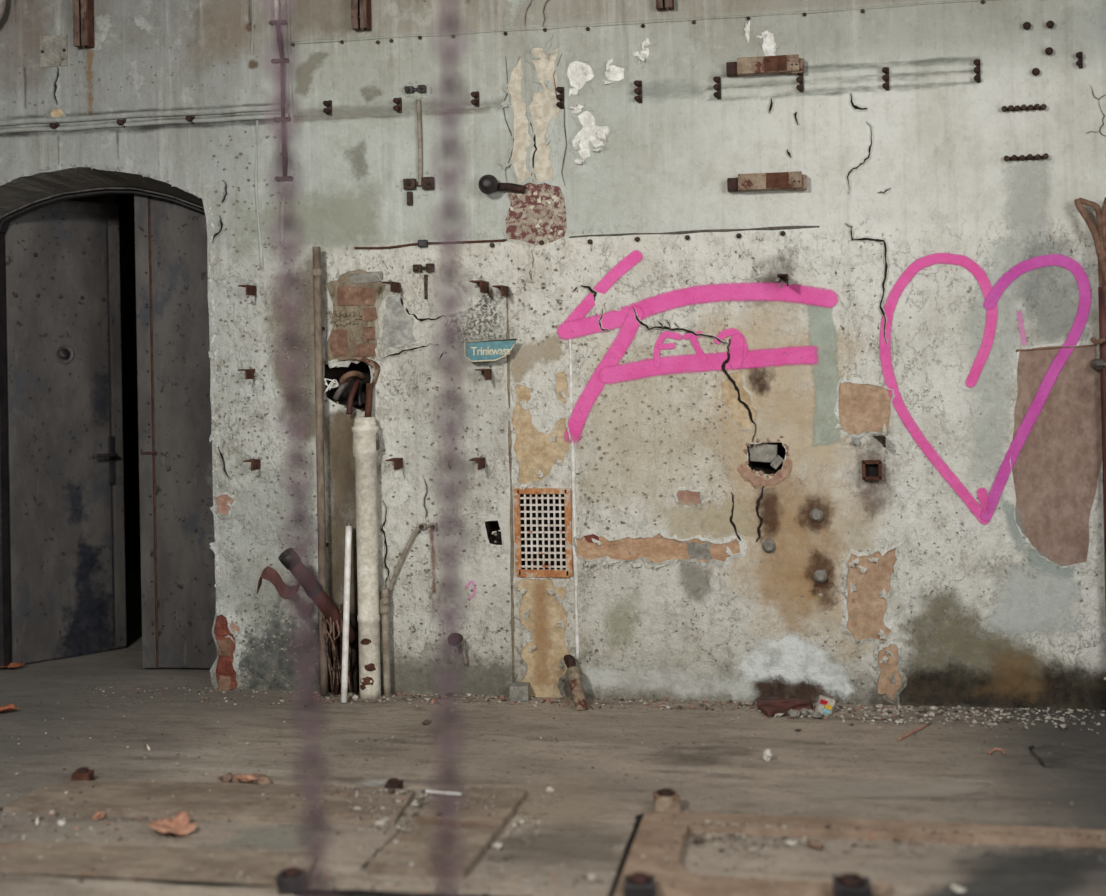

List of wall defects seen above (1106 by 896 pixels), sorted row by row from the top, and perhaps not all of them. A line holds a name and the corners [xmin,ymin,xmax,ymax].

peeling [497,33,654,346]
crack [845,93,874,195]
flaking render [40,135,308,691]
peeling [301,263,442,465]
peeling [464,482,576,698]
crack [572,284,609,333]
peeling [447,337,792,588]
crack [633,307,756,442]
crack [730,486,764,542]
peeling [819,542,912,705]
crack [845,222,890,343]
damp [883,593,1106,710]